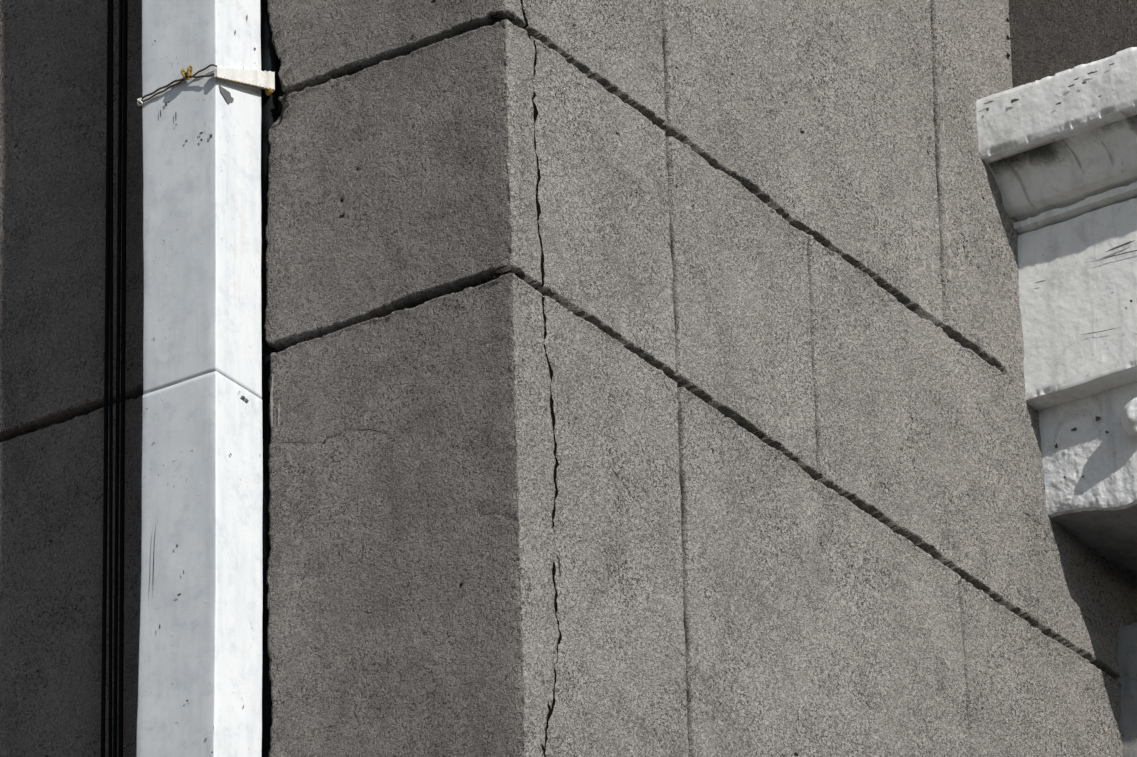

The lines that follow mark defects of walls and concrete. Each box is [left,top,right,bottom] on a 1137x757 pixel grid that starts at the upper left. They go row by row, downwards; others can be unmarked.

crack [520,0,562,757]